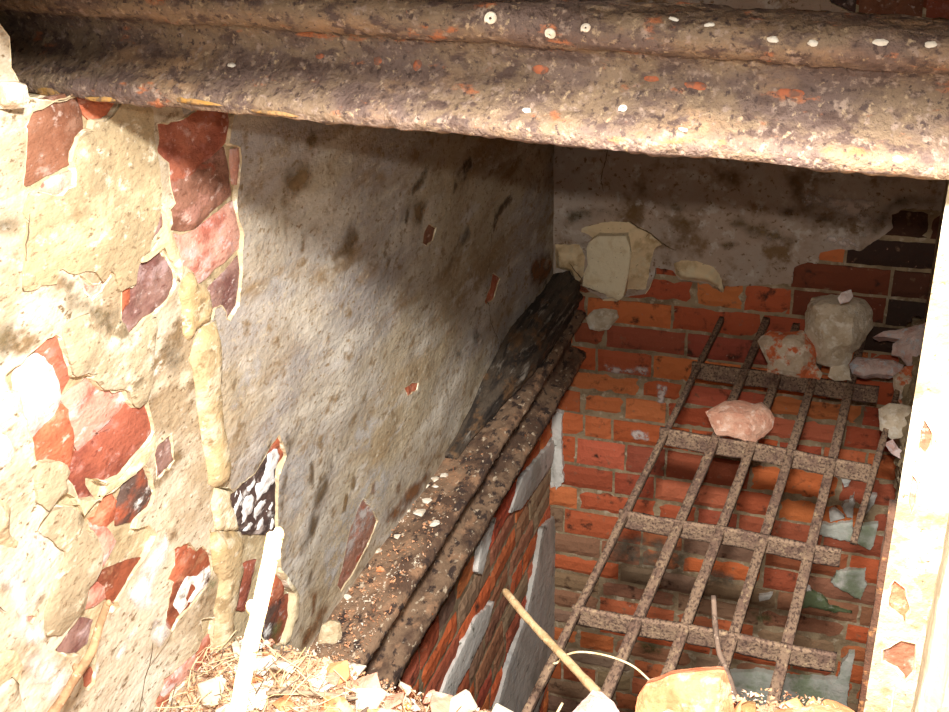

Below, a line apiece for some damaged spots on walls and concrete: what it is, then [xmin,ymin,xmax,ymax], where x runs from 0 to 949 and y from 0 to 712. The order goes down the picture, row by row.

peeling [553,145,946,299]
peeling [5,93,245,691]
flaking render [211,434,288,652]
flaking render [888,579,911,624]
flaking render [881,640,918,683]